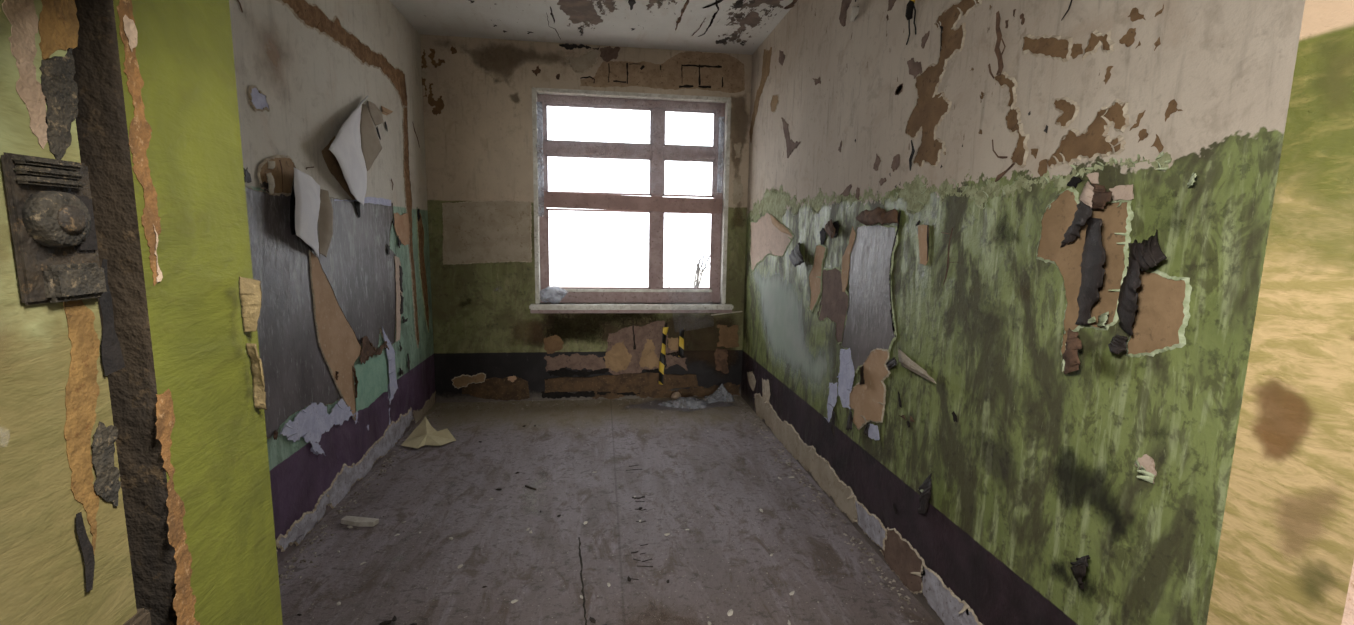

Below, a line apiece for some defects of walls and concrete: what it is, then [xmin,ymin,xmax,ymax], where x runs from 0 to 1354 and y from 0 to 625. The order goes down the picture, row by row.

peeling [557,0,615,25]
flaking render [580,0,785,142]
peeling [748,0,1192,430]
peeling [276,212,436,557]
flaking render [544,335,564,354]
flaking render [605,320,679,375]
flaking render [592,371,983,625]
leakage [1056,451,1125,537]